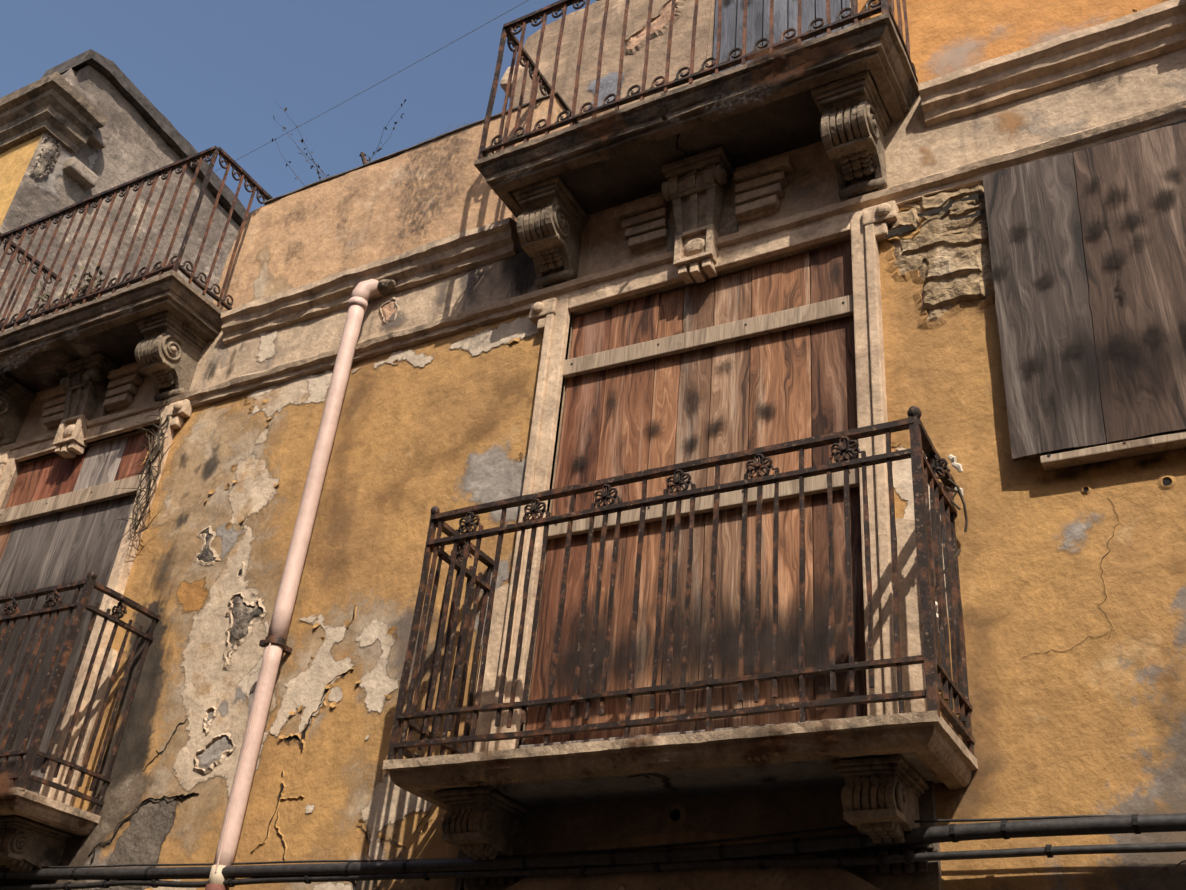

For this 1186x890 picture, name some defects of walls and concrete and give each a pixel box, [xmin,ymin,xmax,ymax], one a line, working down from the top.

water stain [400,135,465,236]
spalling [880,184,995,330]
peeling [449,314,539,357]
peeling [460,445,527,523]
water stain [109,620,162,789]
crack [88,719,199,864]
peeling [69,369,333,890]
crack [250,668,354,860]
peeling [254,596,441,774]
peeling [342,761,432,860]
crack [1022,497,1121,658]
peeling [283,880,376,890]